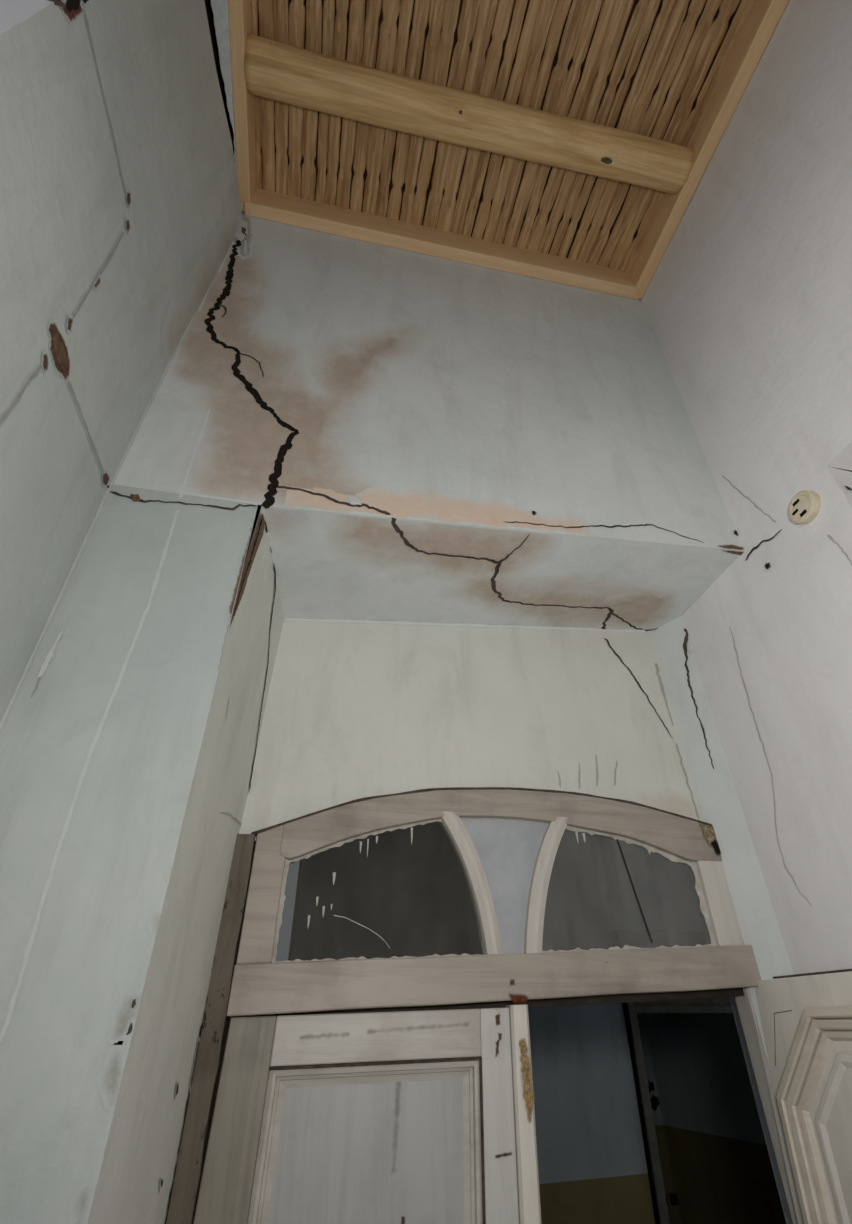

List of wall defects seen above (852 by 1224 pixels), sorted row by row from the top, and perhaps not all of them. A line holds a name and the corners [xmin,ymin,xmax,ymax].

crack [48,0,126,194]
leakage [161,206,692,631]
crack [722,475,782,561]
crack [827,534,852,566]
crack [729,626,812,906]